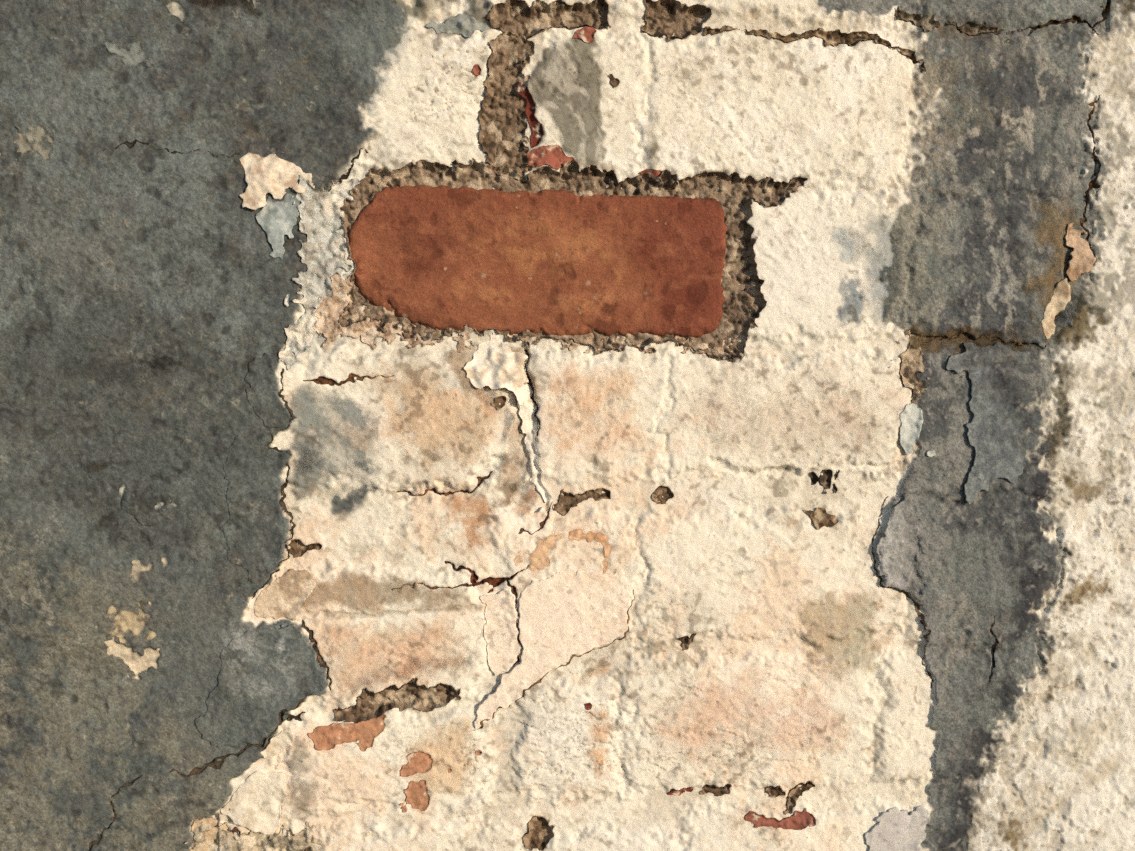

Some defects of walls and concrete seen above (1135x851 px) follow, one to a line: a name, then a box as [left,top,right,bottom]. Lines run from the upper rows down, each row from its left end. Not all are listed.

peeling [426,14,488,38]
peeling [573,27,597,43]
crack [1023,0,1111,36]
crack [1080,95,1101,258]
peeling [1041,223,1098,339]
crack [252,368,392,599]
crack [397,471,493,496]
spalling [184,74,816,851]
crack [518,504,552,535]
spalling [889,328,936,457]
leakage [1049,363,1071,466]
crack [392,561,635,731]